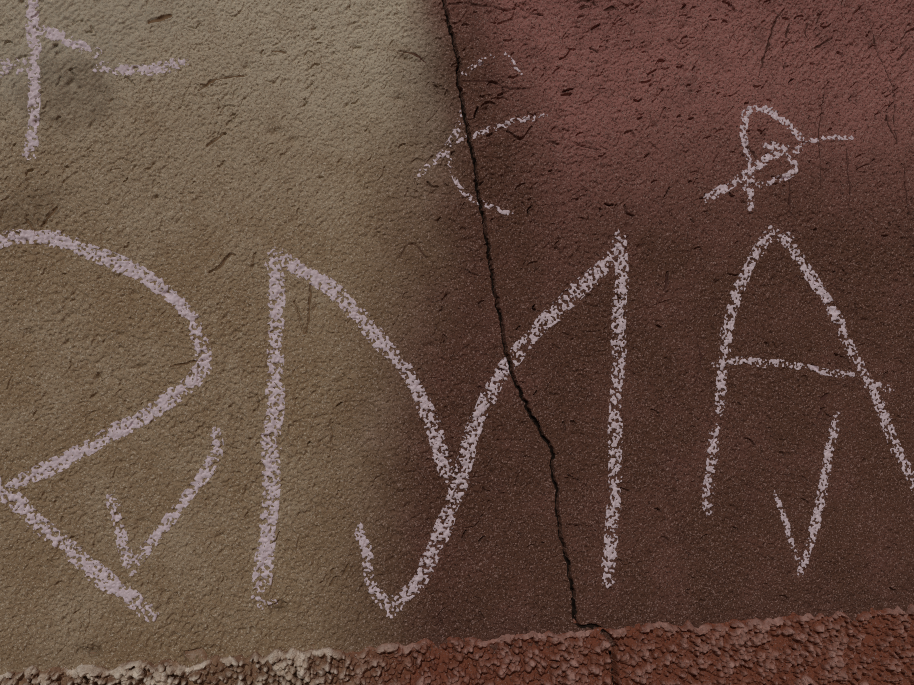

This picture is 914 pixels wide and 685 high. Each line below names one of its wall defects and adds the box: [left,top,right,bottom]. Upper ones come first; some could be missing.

crack [442,0,614,685]